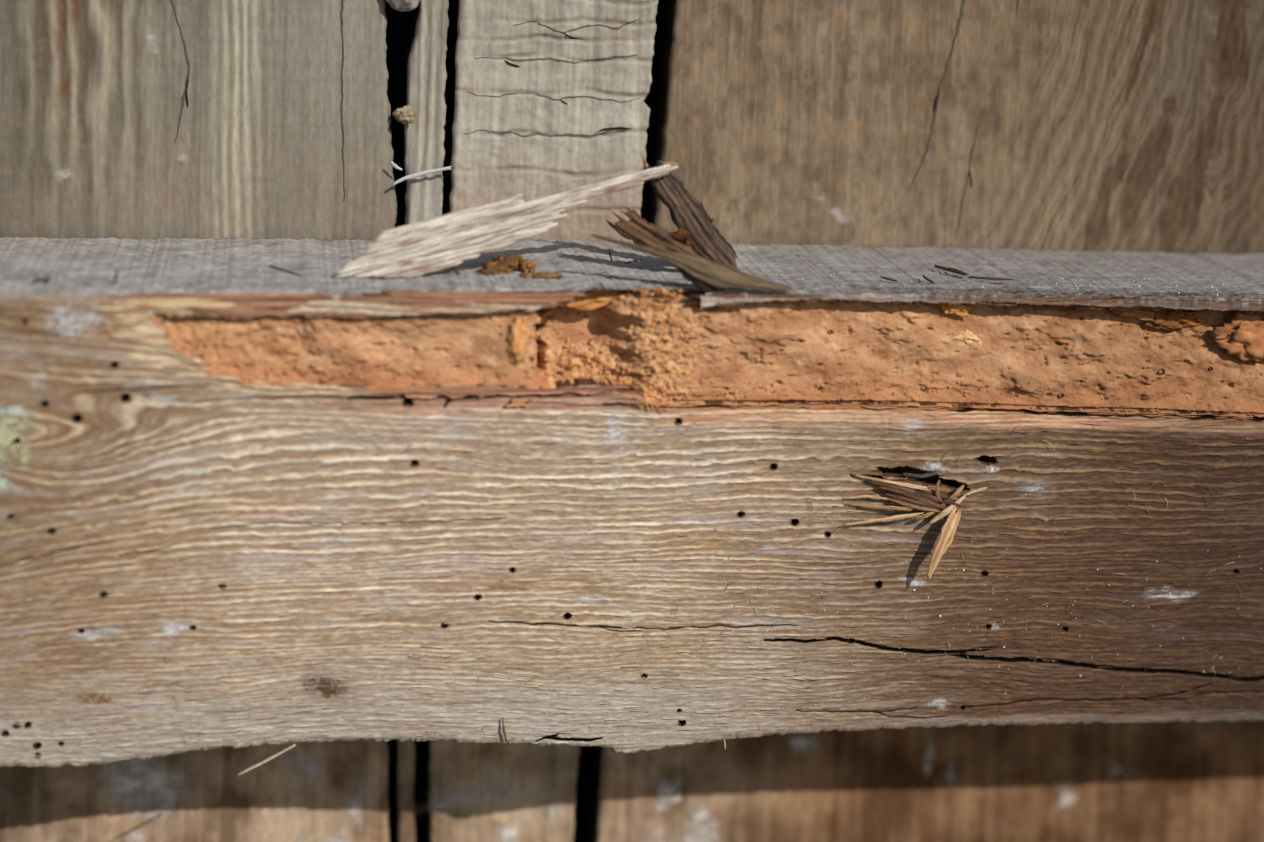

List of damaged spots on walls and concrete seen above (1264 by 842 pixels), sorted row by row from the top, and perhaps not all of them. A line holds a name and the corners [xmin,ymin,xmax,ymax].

crack [171,0,190,141]
crack [910,0,965,189]
crack [956,135,977,239]
spalling [152,269,1264,422]
crack [489,621,1264,718]